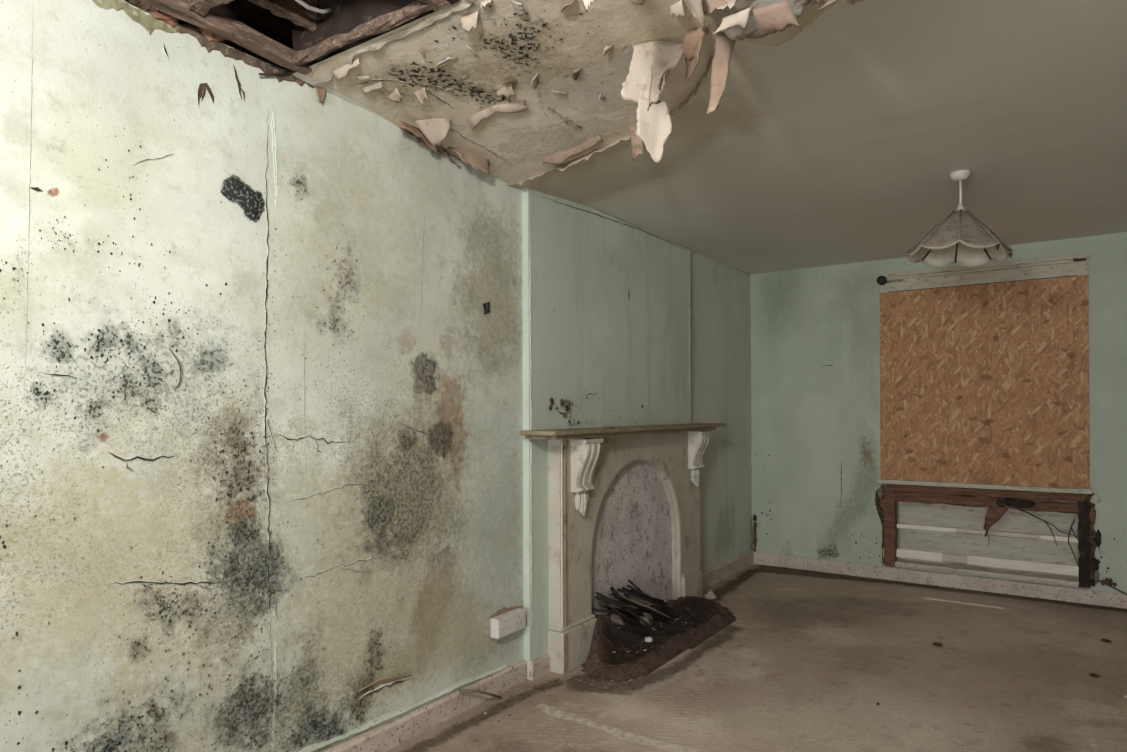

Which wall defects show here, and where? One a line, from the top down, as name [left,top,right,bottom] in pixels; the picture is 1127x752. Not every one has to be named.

crack [134,154,173,165]
flaking render [92,0,314,101]
peeling [197,83,214,106]
peeling [415,118,451,147]
peeling [466,45,637,130]
water stain [221,175,276,234]
water stain [310,224,365,373]
crack [261,111,402,675]
crack [108,451,177,472]
water stain [334,345,466,567]
water stain [4,287,400,752]
crack [106,580,233,594]